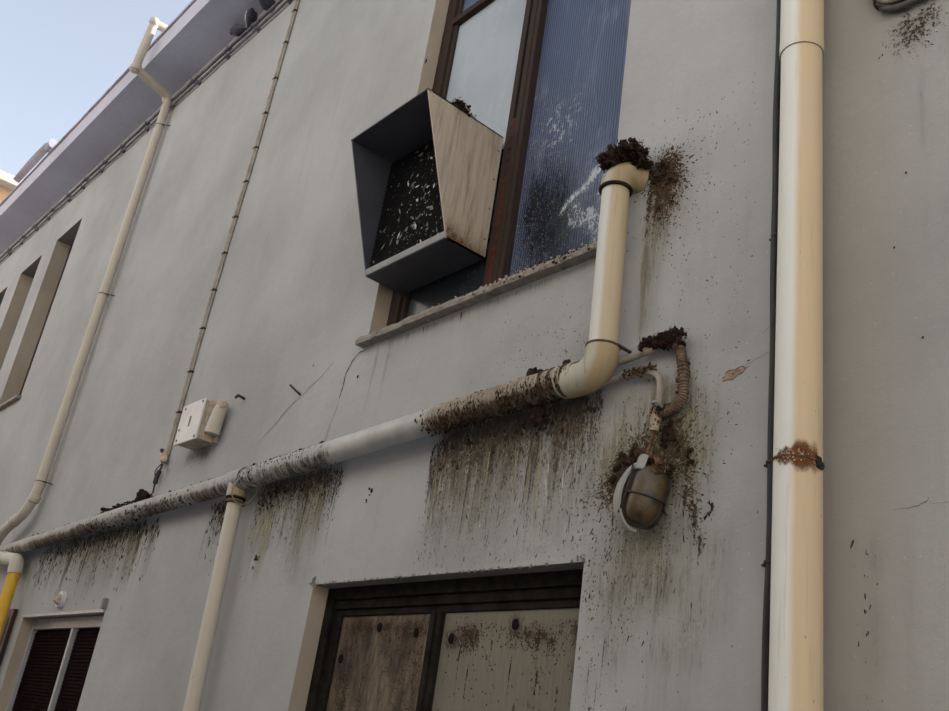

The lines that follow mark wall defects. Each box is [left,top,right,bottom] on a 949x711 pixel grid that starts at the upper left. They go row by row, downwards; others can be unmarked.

damp [33,516,160,605]
damp [248,462,343,575]
damp [413,329,740,711]